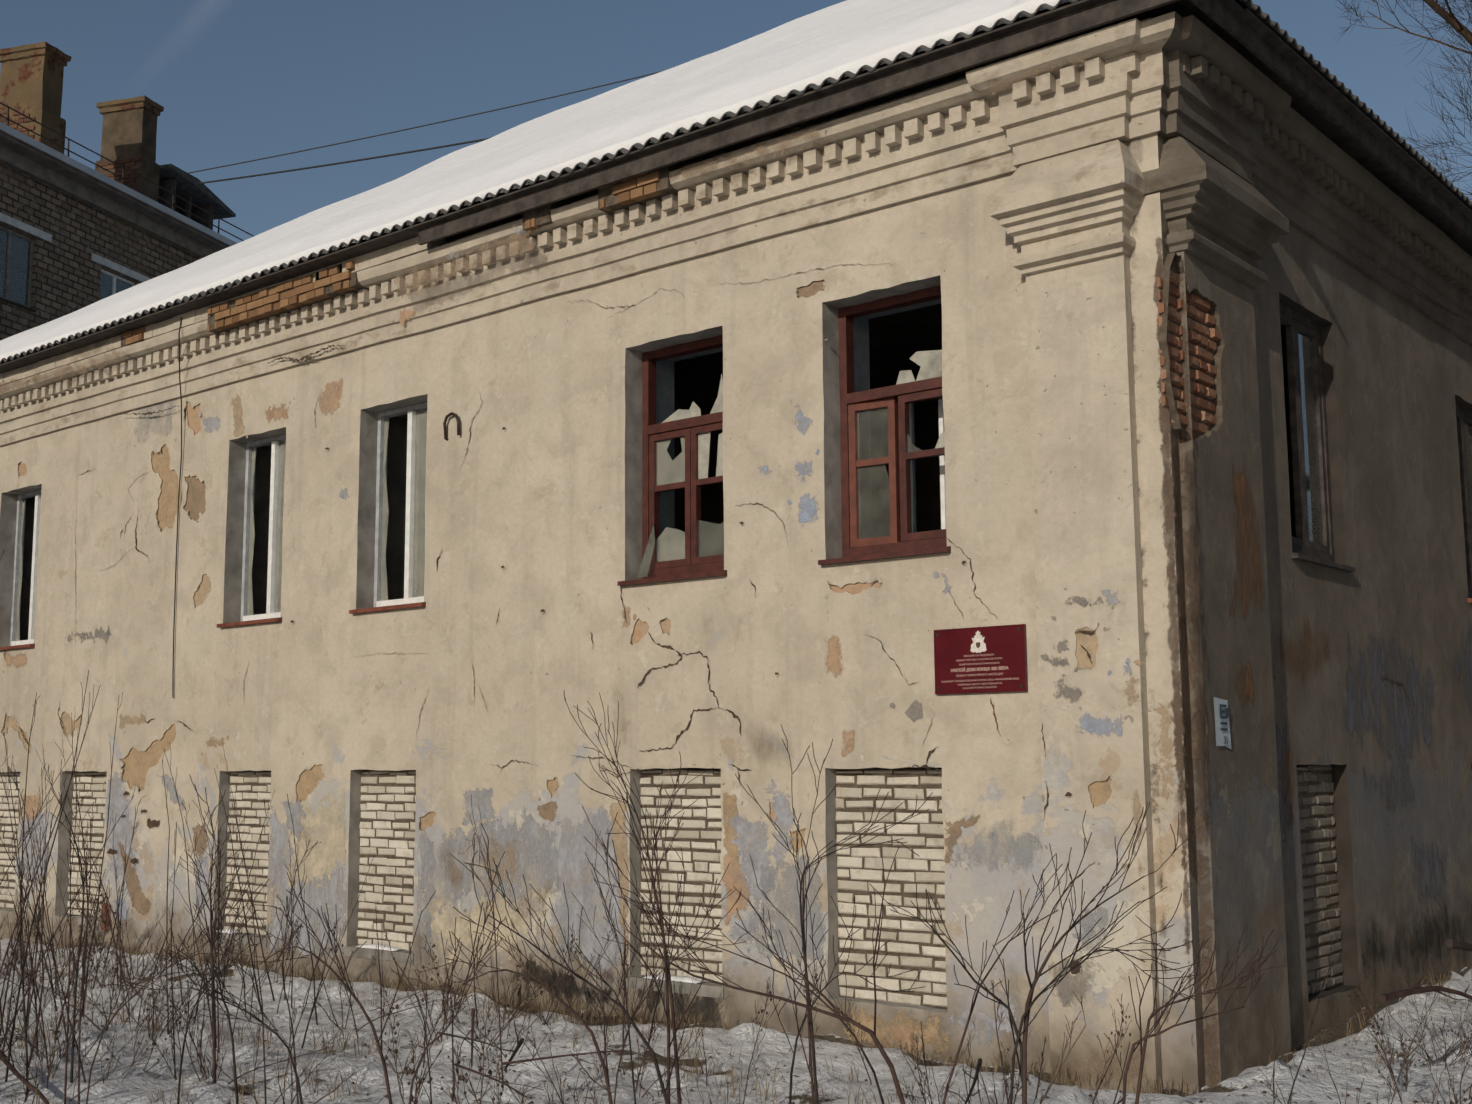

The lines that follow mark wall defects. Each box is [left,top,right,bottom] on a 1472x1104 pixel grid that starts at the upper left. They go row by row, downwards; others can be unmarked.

flaking render [207,260,356,333]
flaking render [1157,252,1225,440]
spalling [151,444,206,532]
spalling [826,578,882,595]
crack [948,539,997,619]
crack [573,586,751,784]
spalling [1040,627,1146,705]
spalling [1064,776,1112,808]
peeling [188,825,211,914]
peeling [267,764,347,957]
peeling [722,779,826,971]
water stain [638,989,718,1027]